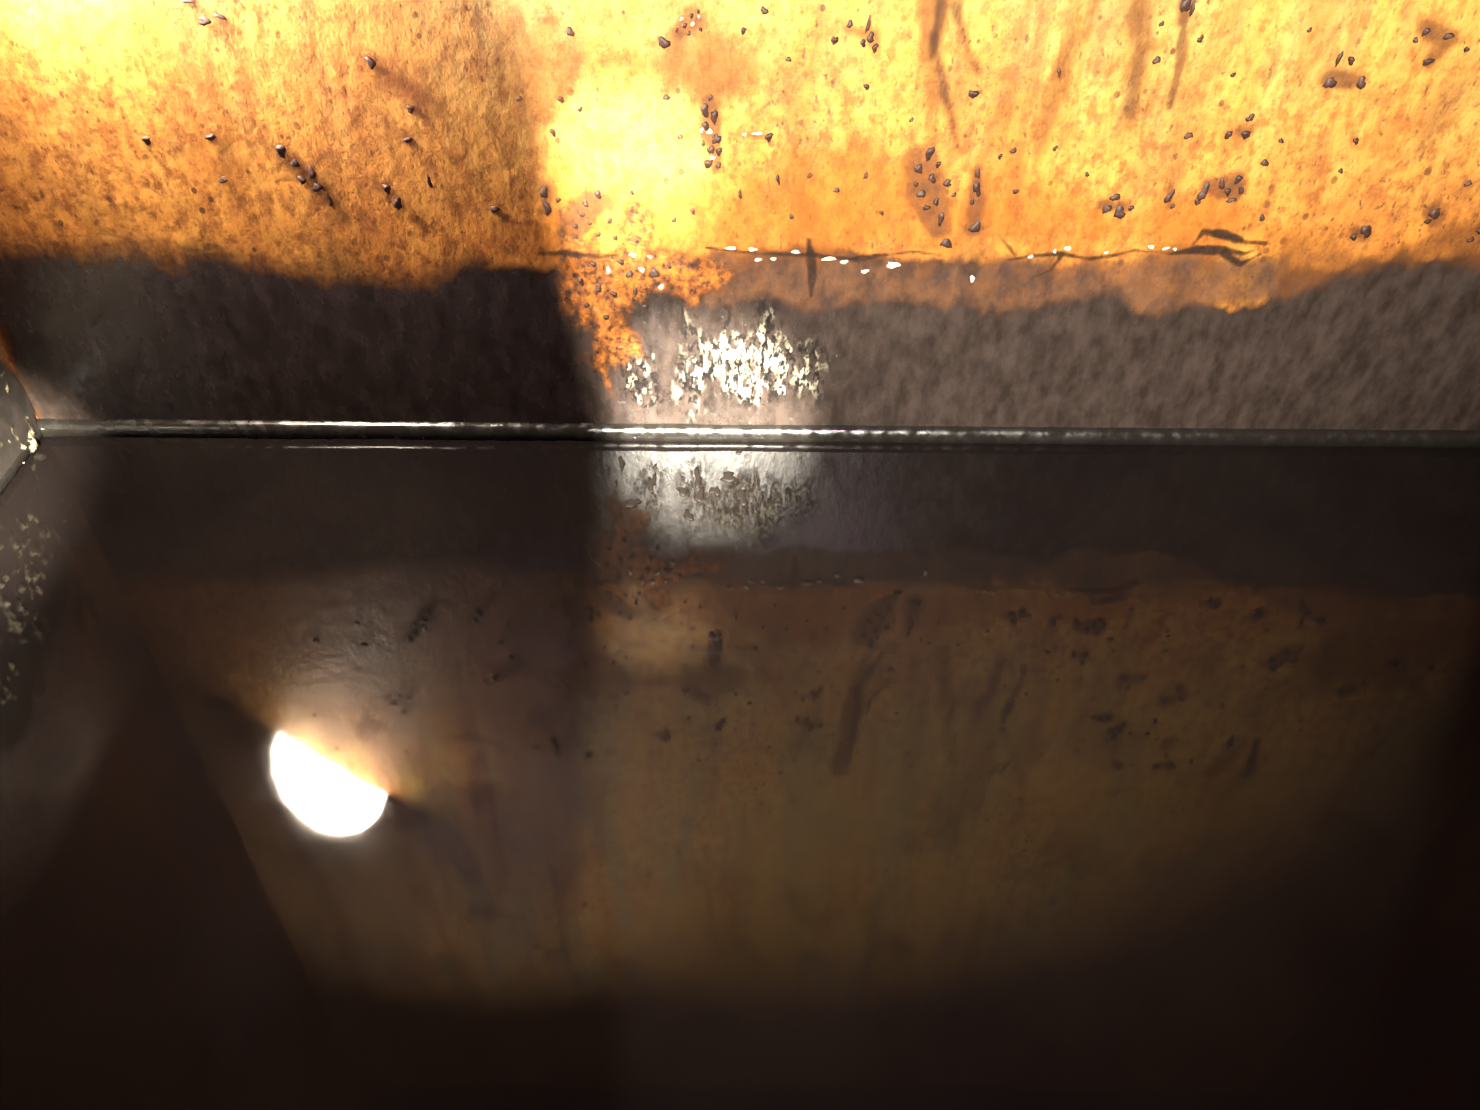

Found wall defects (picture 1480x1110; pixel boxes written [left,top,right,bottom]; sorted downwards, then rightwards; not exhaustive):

crack [706,240,914,297]
crack [1008,246,1117,267]
crack [1171,229,1267,266]
leakage [0,246,1480,480]